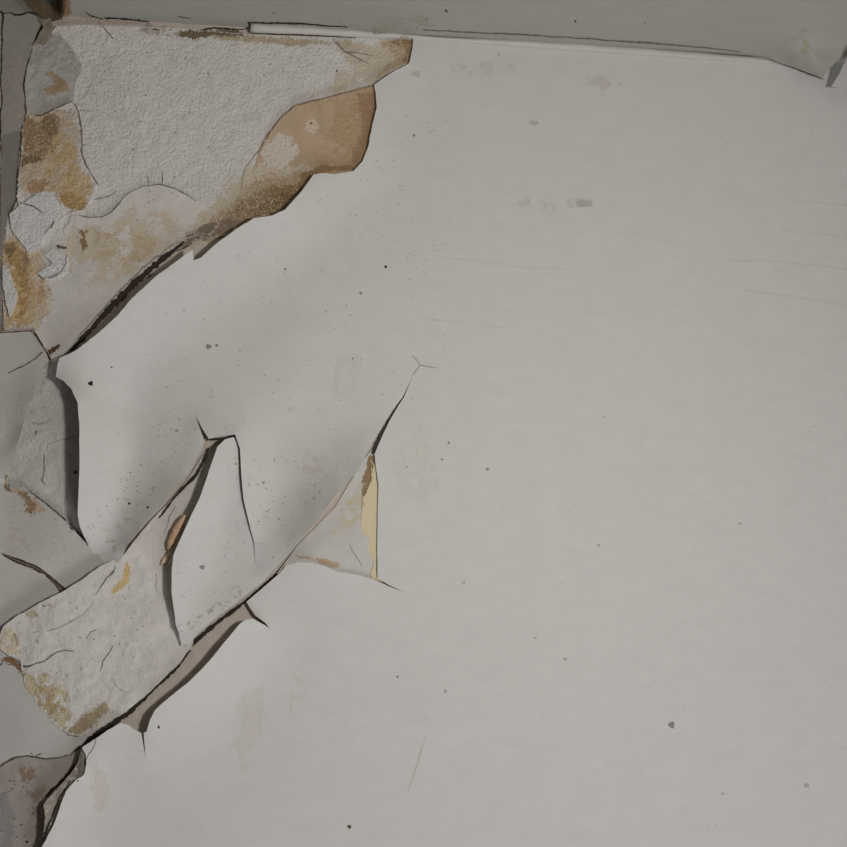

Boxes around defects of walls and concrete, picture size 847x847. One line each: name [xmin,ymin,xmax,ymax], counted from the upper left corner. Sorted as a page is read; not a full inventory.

water stain [57,0,181,37]
crack [178,16,373,64]
crack [422,30,738,52]
crack [771,60,824,80]
peeling [831,58,847,87]
water stain [0,10,437,289]
water stain [0,232,55,335]
spalling [0,25,413,736]
spalling [42,749,85,846]